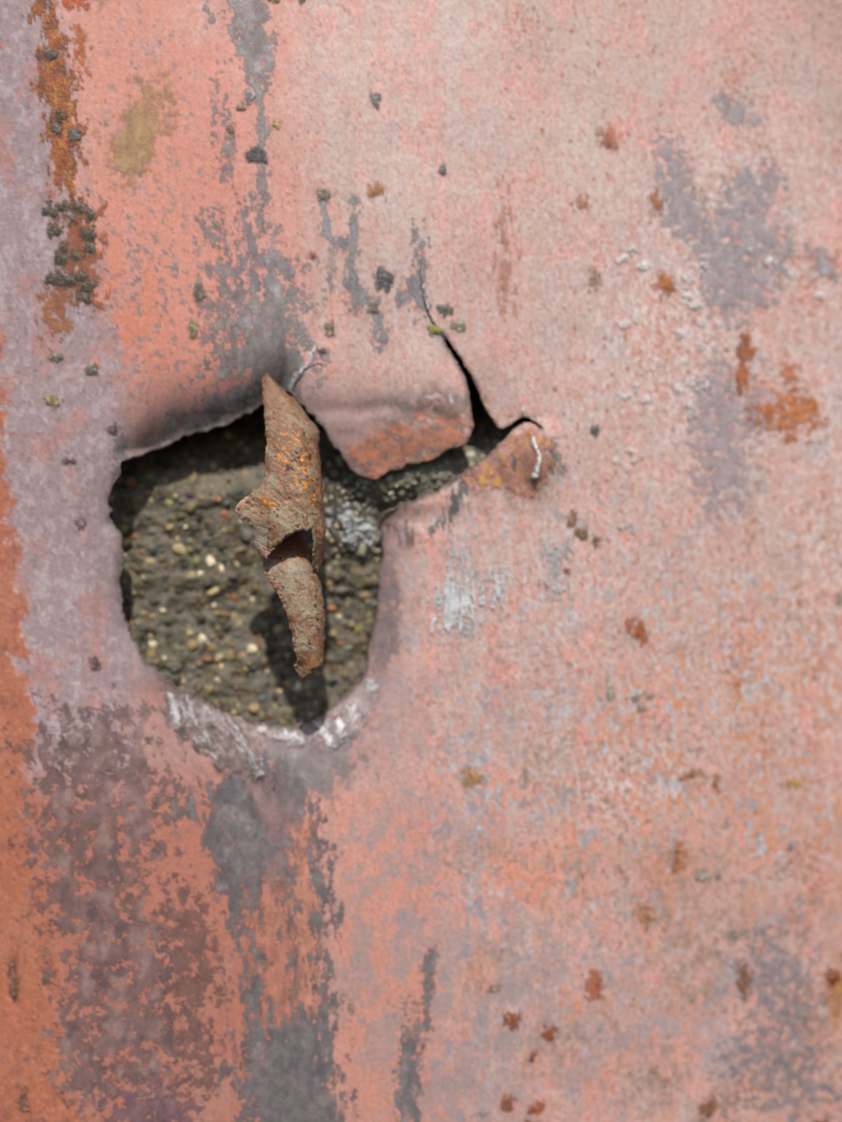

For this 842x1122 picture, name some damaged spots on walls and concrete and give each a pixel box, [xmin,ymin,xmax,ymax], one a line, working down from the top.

rust [27,0,111,352]
peeling [108,422,130,483]
peeling [145,0,466,447]
crack [419,261,501,427]
peeling [705,87,769,132]
peeling [649,126,838,528]
rust [730,325,830,443]
peeling [4,684,369,1122]